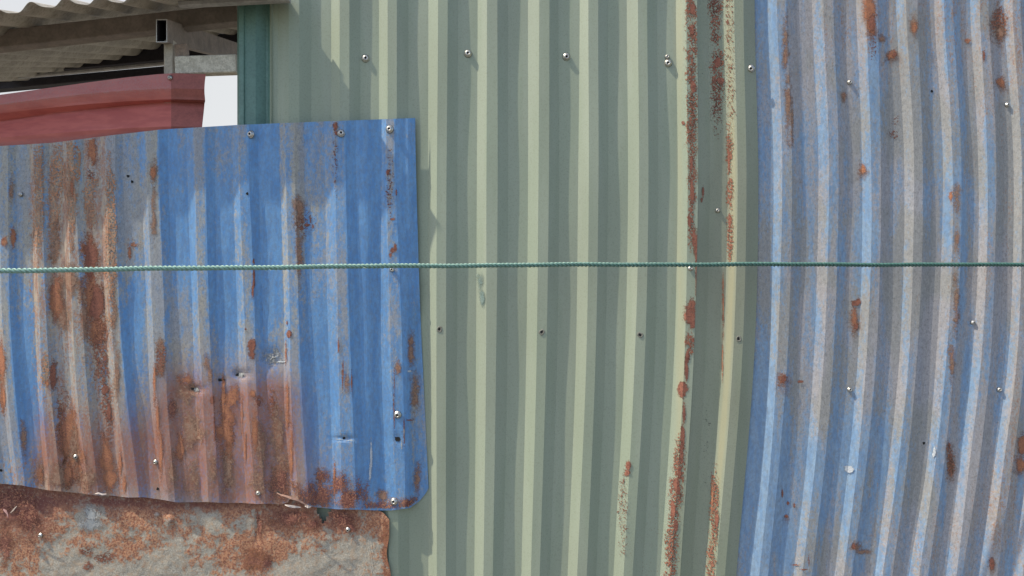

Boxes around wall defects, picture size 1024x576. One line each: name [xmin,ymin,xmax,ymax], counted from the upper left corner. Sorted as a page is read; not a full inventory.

rust [863,0,897,66]
rust [990,1,1008,44]
rust [681,0,736,276]
rust [0,138,421,576]
rust [849,298,861,332]
rust [617,460,631,554]
rust [663,433,687,576]
rust [706,463,720,576]
rust [946,443,955,480]